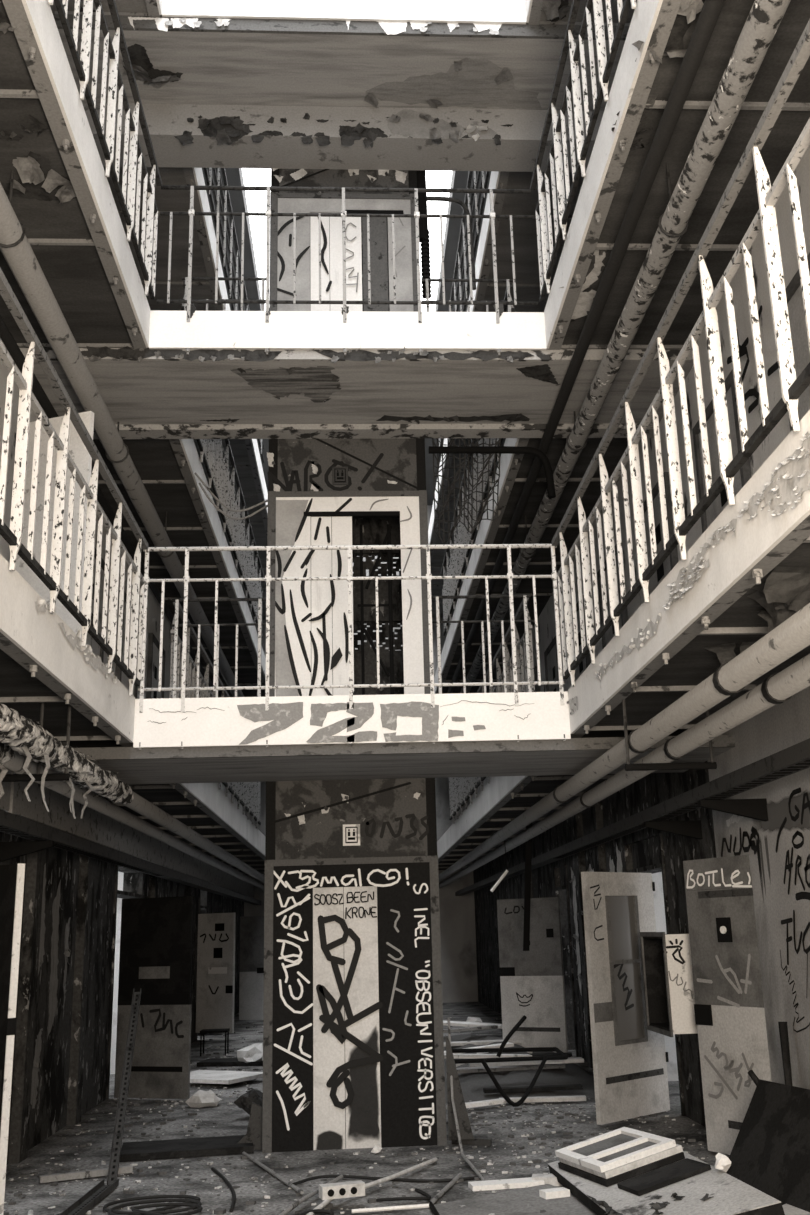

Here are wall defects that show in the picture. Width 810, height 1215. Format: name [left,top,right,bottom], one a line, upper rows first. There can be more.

peeling [0,1,18,36]
peeling [121,17,231,89]
peeling [632,0,703,63]
peeling [174,109,513,148]
peeling [630,94,668,151]
peeling [570,250,607,323]
peeling [86,343,560,403]
peeling [595,431,810,682]